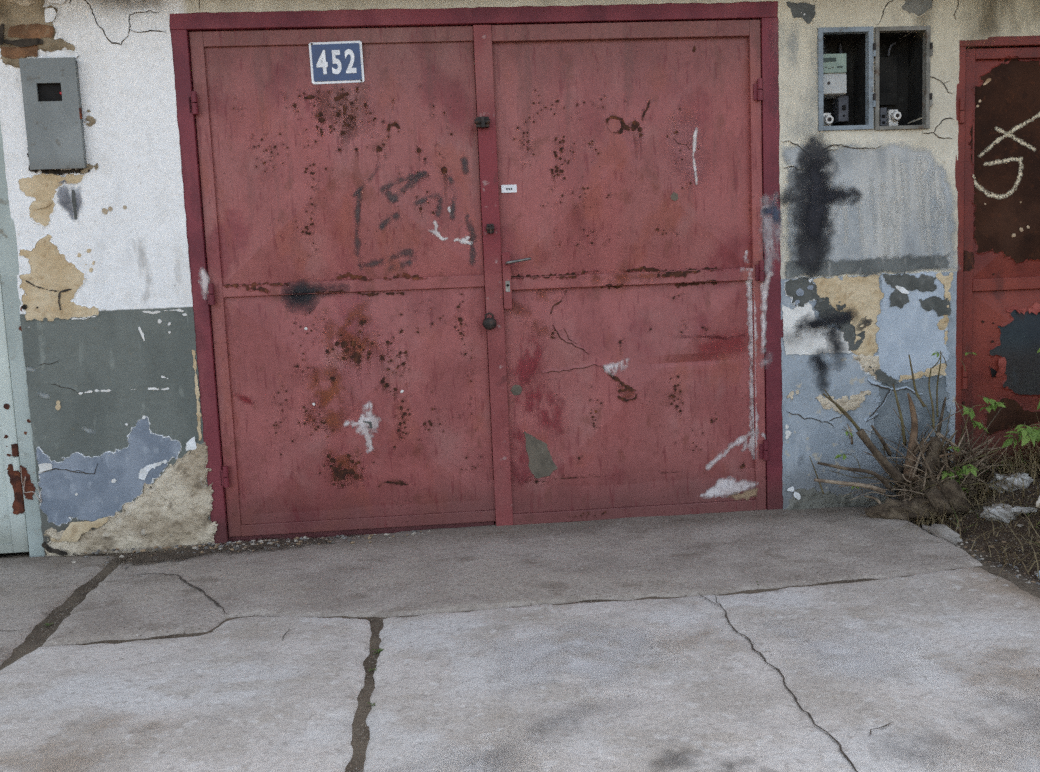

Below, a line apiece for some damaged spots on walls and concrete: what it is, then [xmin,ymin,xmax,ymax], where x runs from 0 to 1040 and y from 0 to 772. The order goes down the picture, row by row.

flaking render [0,0,78,69]
crack [70,0,166,45]
corrosion [284,87,400,250]
corrosion [600,98,650,137]
peeling [17,147,105,328]
corrosion [4,435,36,515]
flaking render [35,350,218,557]
corrosion [325,315,444,448]
peeling [782,270,953,510]
peeling [983,302,1040,436]
crack [128,573,229,615]
crack [699,594,858,772]